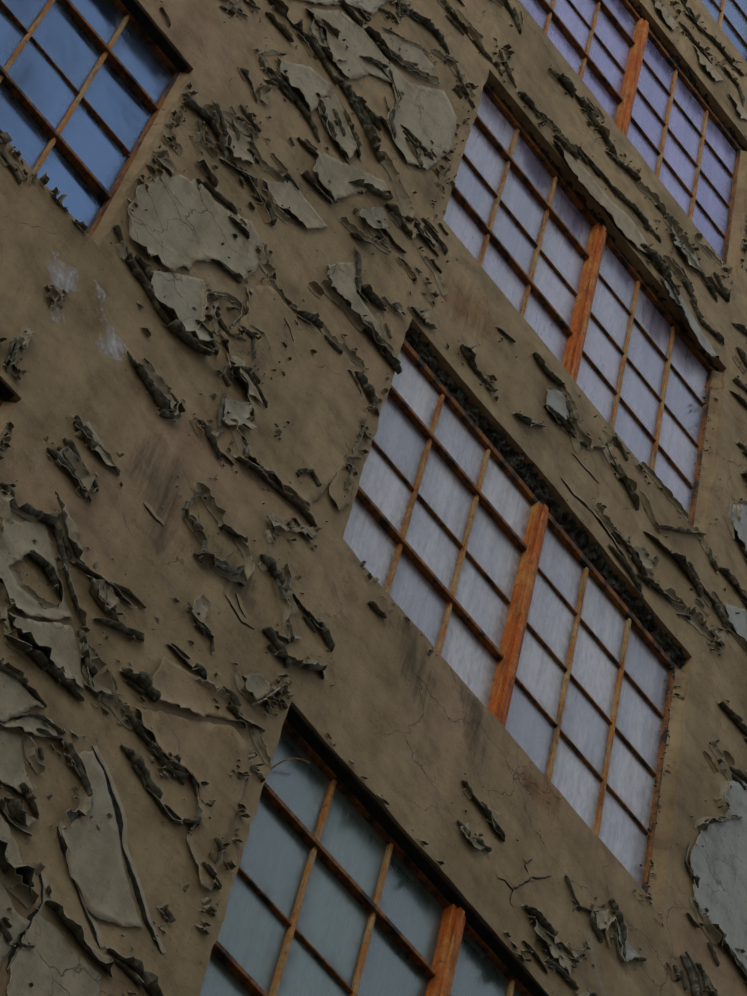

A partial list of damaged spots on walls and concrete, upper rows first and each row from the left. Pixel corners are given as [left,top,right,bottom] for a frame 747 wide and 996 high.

peeling [44,415,124,502]
peeling [110,0,747,852]
peeling [0,475,336,996]
crack [495,852,552,908]
peeling [504,875,647,996]
peeling [676,738,747,985]